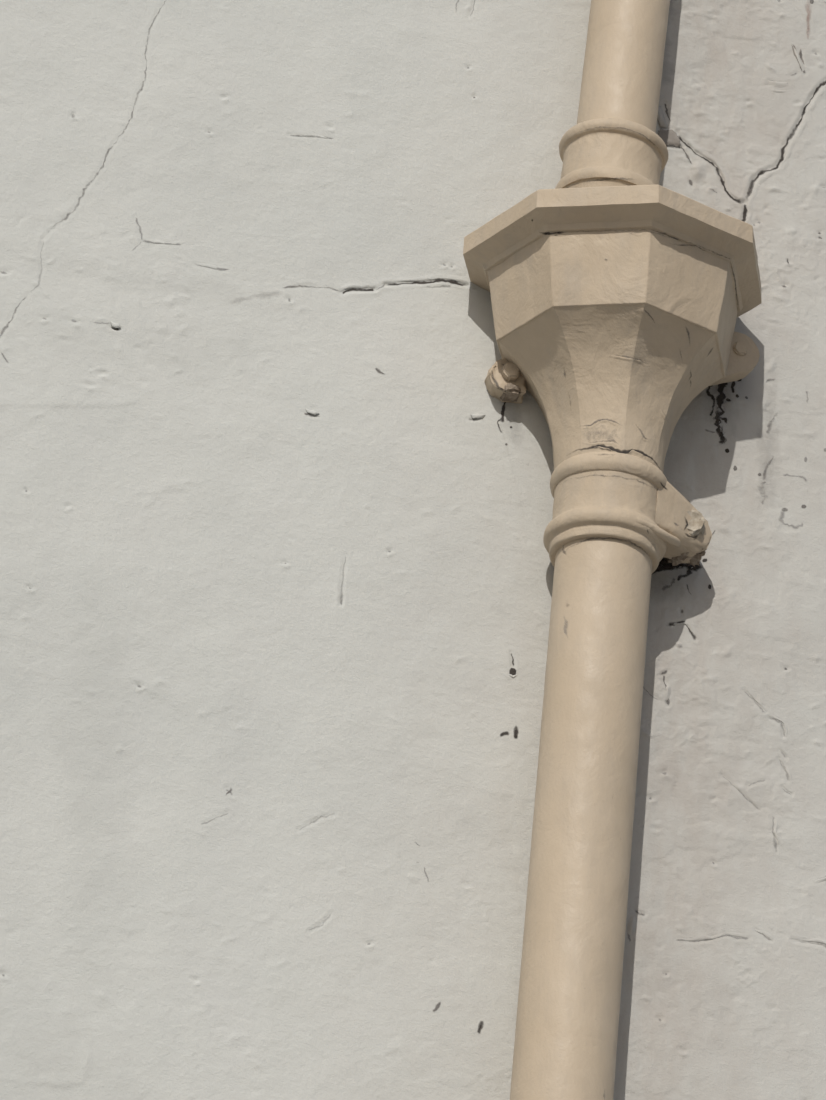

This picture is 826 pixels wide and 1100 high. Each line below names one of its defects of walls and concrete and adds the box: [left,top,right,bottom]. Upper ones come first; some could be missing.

spalling [657,104,681,149]
crack [679,81,826,223]
crack [142,238,230,270]
crack [334,276,468,294]
crack [676,929,826,945]